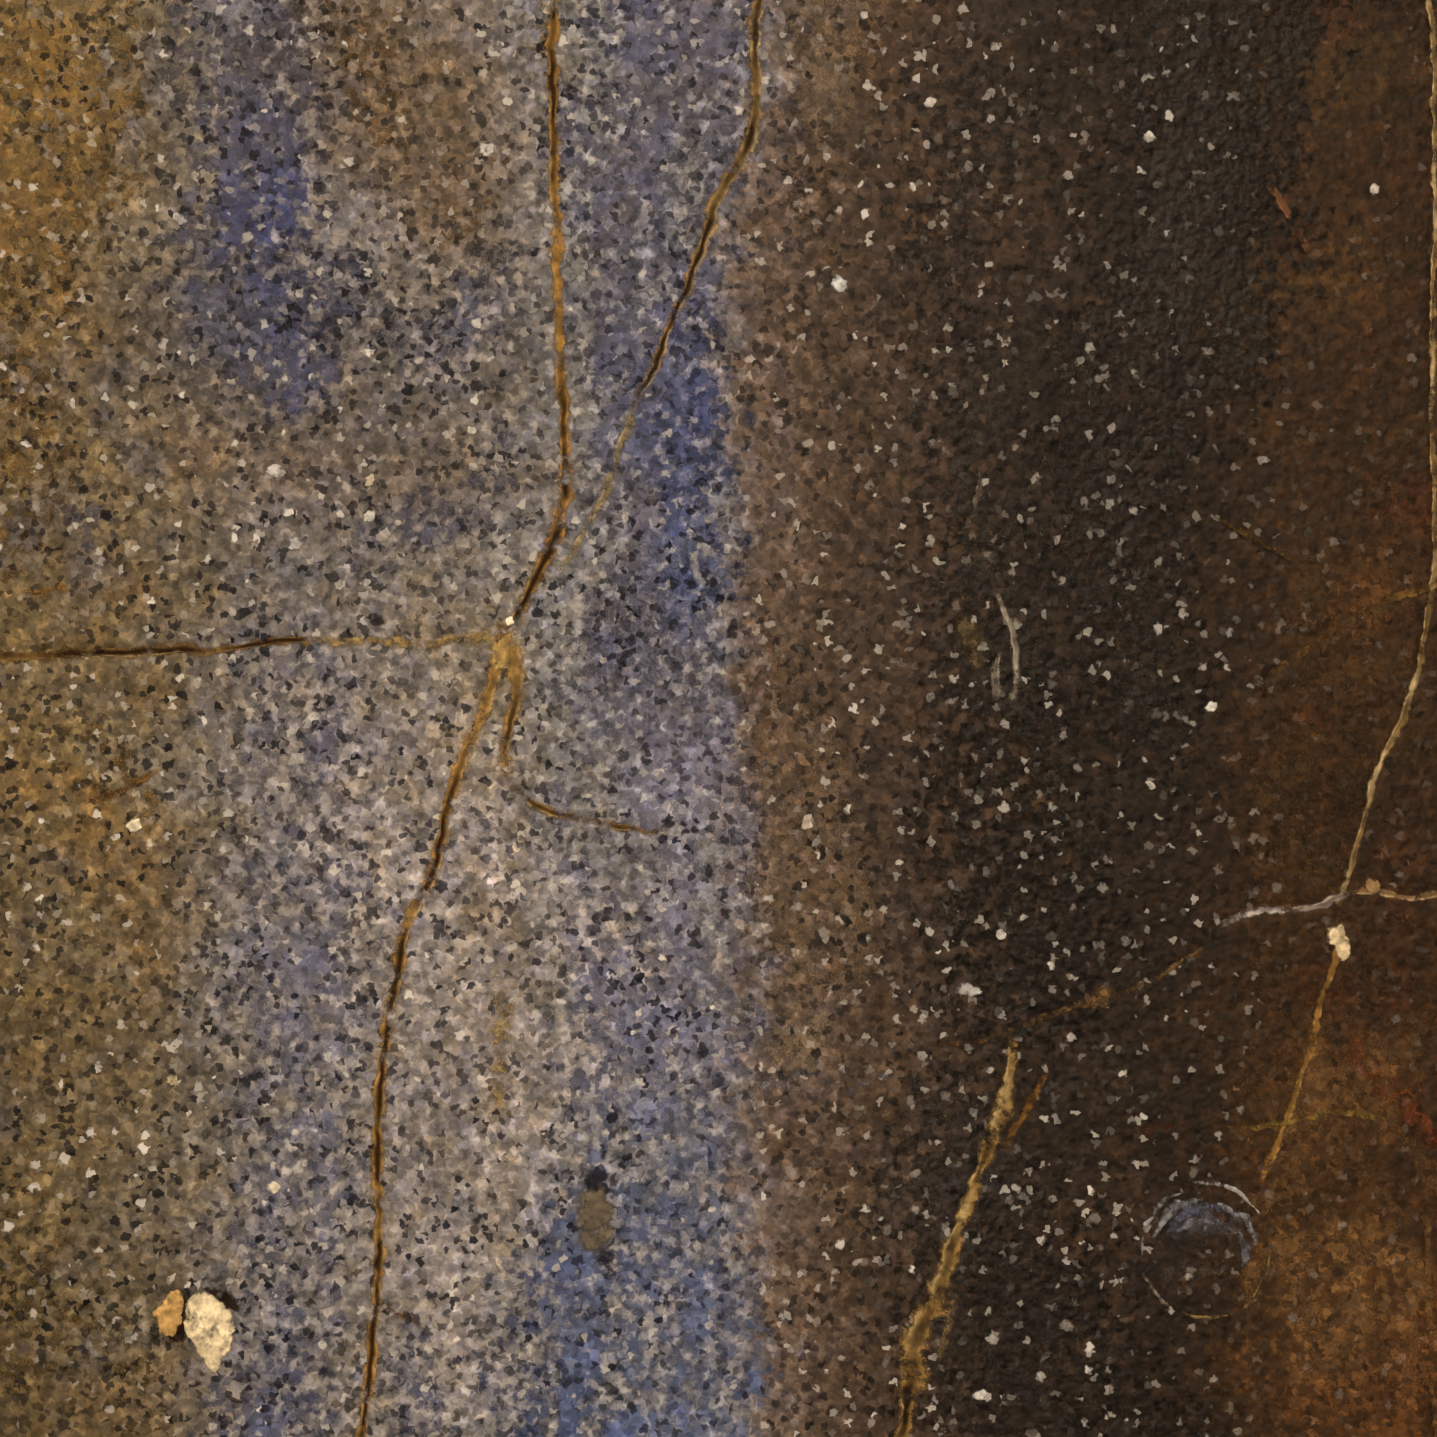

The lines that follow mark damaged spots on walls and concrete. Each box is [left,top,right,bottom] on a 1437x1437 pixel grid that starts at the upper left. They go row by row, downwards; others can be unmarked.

crack [1274,0,1437,902]
crack [0,0,764,1437]
crack [895,948,1202,1437]
crack [1242,947,1377,1180]
corrosion [1214,444,1437,1437]
crack [1424,1228,1432,1334]
crack [1429,1369,1437,1437]